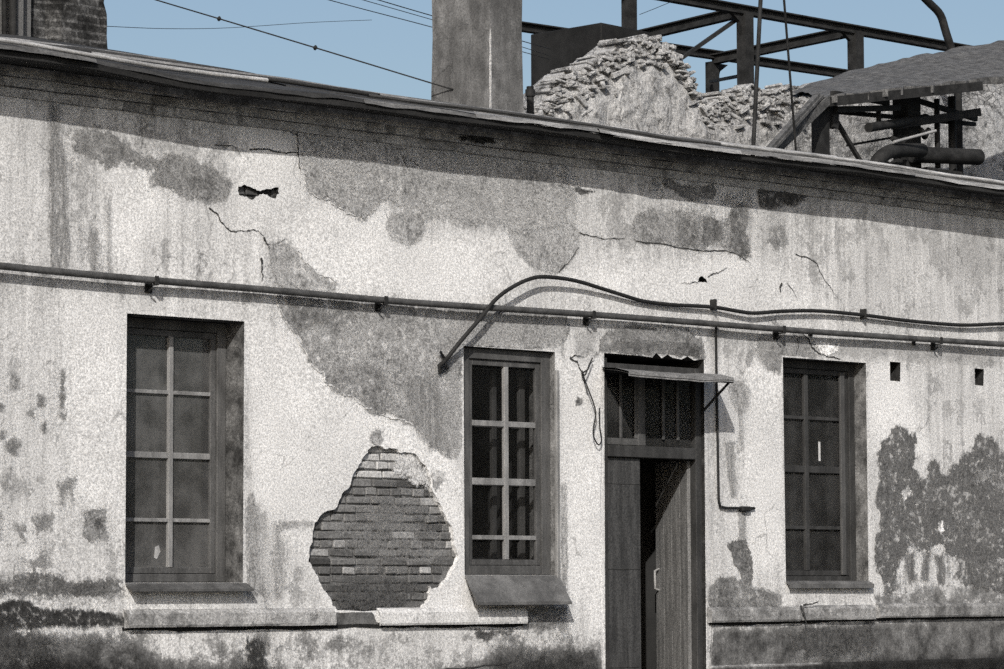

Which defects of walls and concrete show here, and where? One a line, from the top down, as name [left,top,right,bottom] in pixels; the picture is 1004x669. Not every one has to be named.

flaking render [72,124,276,205]
crack [209,208,285,280]
crack [215,132,301,170]
flaking render [298,133,595,235]
flaking render [632,178,809,259]
peeling [268,241,570,459]
damp [57,476,76,504]
damp [14,512,55,543]
damp [29,551,51,571]
flaking render [308,429,456,625]
damp [0,626,157,669]
damp [242,635,268,669]